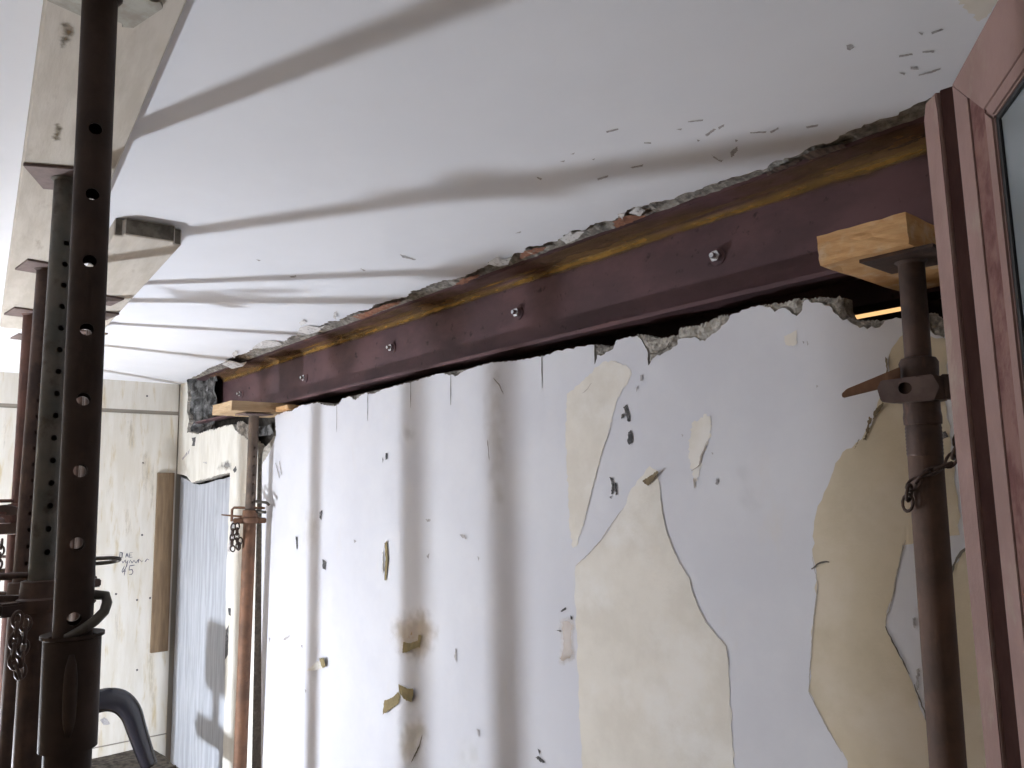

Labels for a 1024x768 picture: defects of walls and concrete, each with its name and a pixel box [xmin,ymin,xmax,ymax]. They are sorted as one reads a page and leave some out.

spalling [182,98,931,463]
peeling [565,344,642,548]
peeling [682,414,713,488]
peeling [929,313,947,376]
peeling [941,401,960,536]
peeling [383,684,413,714]
peeling [560,466,735,768]
peeling [808,399,929,768]